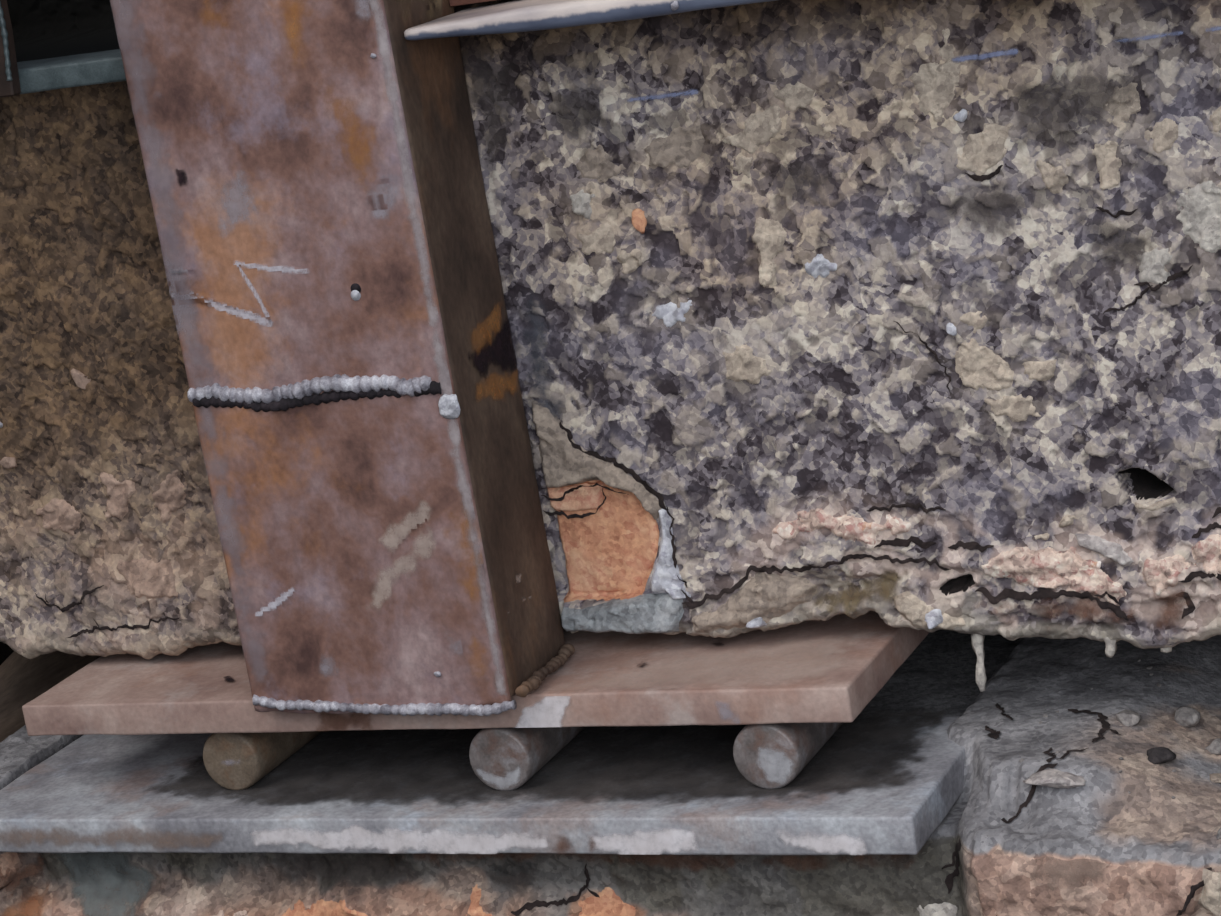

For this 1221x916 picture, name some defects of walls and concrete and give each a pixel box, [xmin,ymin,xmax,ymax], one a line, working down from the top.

spalling [529,398,691,634]
crack [1192,507,1221,538]
crack [975,587,1129,621]
crack [1177,571,1221,619]
crack [985,703,1013,739]
crack [1001,709,1121,823]
crack [511,863,600,916]